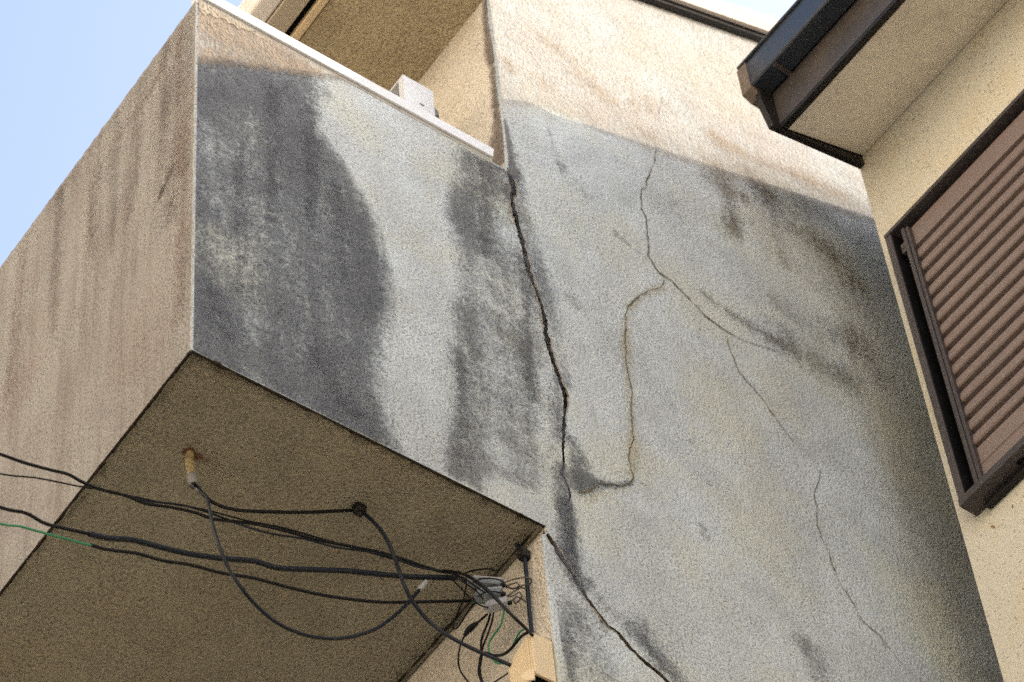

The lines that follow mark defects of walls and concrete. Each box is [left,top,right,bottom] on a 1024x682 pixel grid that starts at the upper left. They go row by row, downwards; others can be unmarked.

water stain [0,0,552,596]
crack [507,152,797,499]
water stain [397,596,475,682]
crack [543,530,669,682]
crack [814,468,916,676]